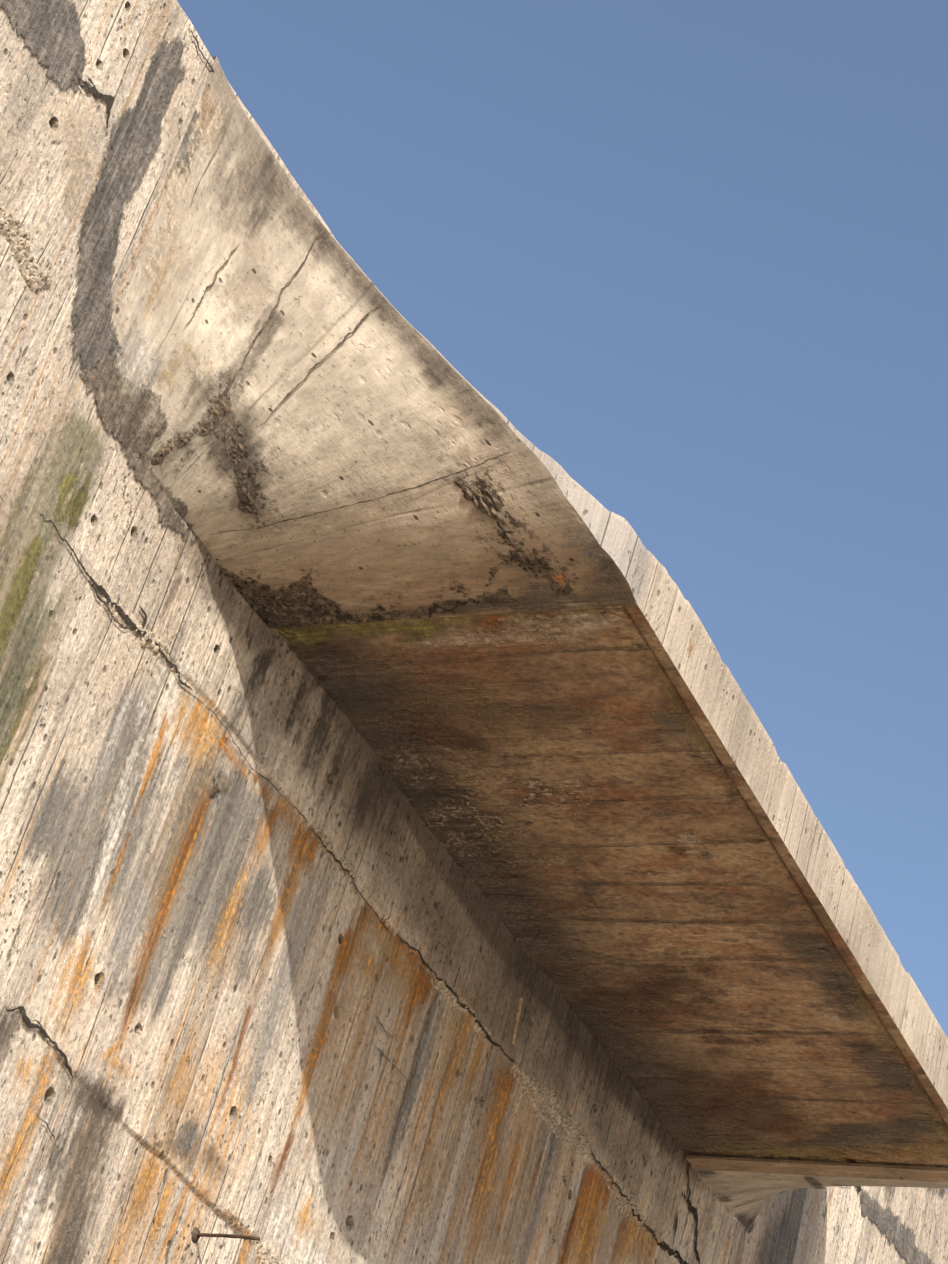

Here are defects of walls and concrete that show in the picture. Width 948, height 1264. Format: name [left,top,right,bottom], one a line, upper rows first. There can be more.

leakage [55,473,91,528]
leakage [142,310,283,519]
leakage [0,590,65,788]
corrosion [127,788,212,1016]
corrosion [141,699,320,961]
crack [38,511,517,1065]
crack [418,599,631,619]
leakage [277,645,948,1174]
corrosion [0,1052,56,1196]
crack [5,1006,74,1081]
corrosion [273,904,434,1190]
crack [591,1152,700,1264]